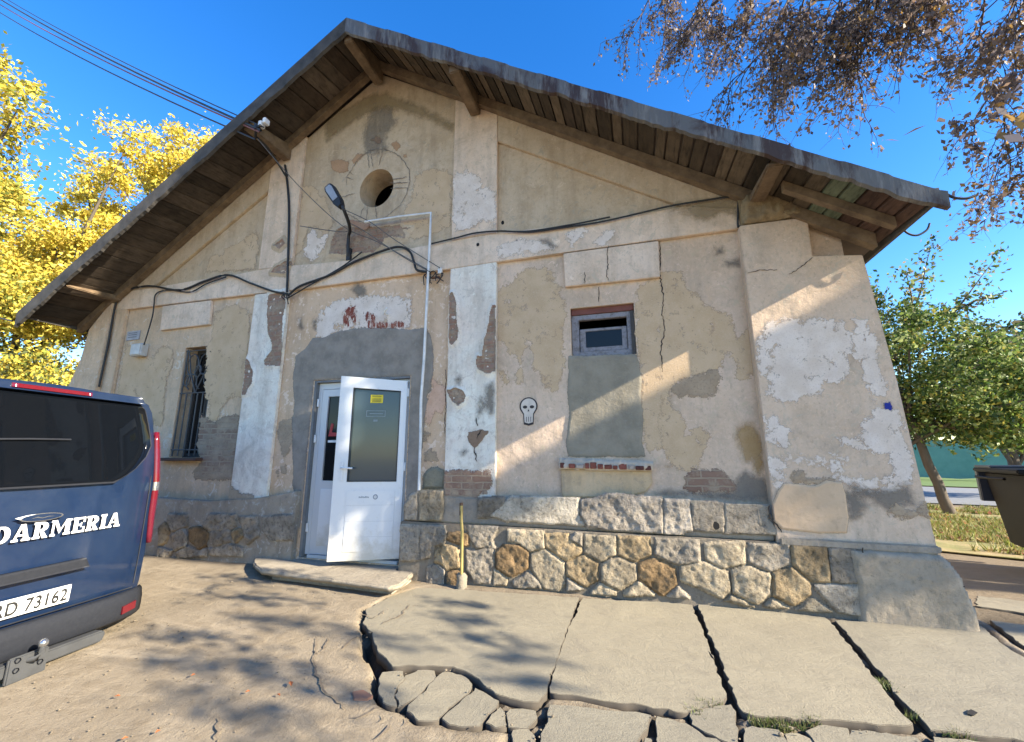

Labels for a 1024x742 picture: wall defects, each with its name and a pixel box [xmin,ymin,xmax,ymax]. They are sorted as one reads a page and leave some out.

peeling [194,168,497,498]
crack [658,246,666,372]
peeling [634,271,931,520]